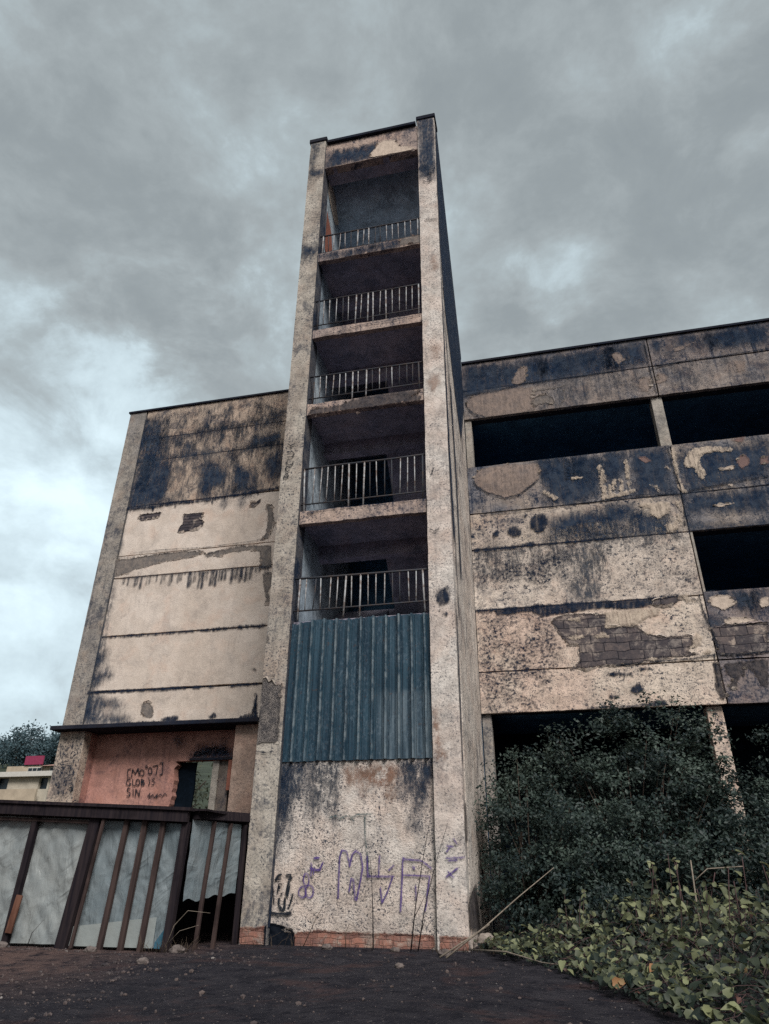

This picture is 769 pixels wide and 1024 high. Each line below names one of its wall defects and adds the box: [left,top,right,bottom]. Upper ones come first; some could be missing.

damp [124,407,283,522]
damp [418,118,769,761]
peeling [597,456,650,500]
peeling [640,437,769,532]
peeling [114,499,276,605]
damp [84,566,268,724]
spalling [551,593,769,700]
damp [276,764,338,843]
damp [403,761,431,827]